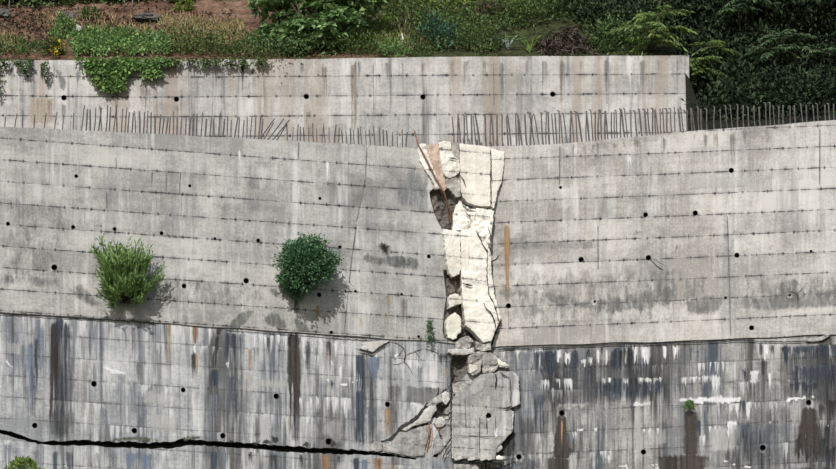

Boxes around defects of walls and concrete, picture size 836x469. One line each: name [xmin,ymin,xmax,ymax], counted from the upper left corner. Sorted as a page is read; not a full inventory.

peeling [33,102,835,469]
water stain [18,318,76,434]
crack [0,328,515,463]
water stain [209,311,379,463]
water stain [383,385,440,407]
water stain [481,347,750,469]
water stain [700,421,763,469]
water stain [743,339,836,469]